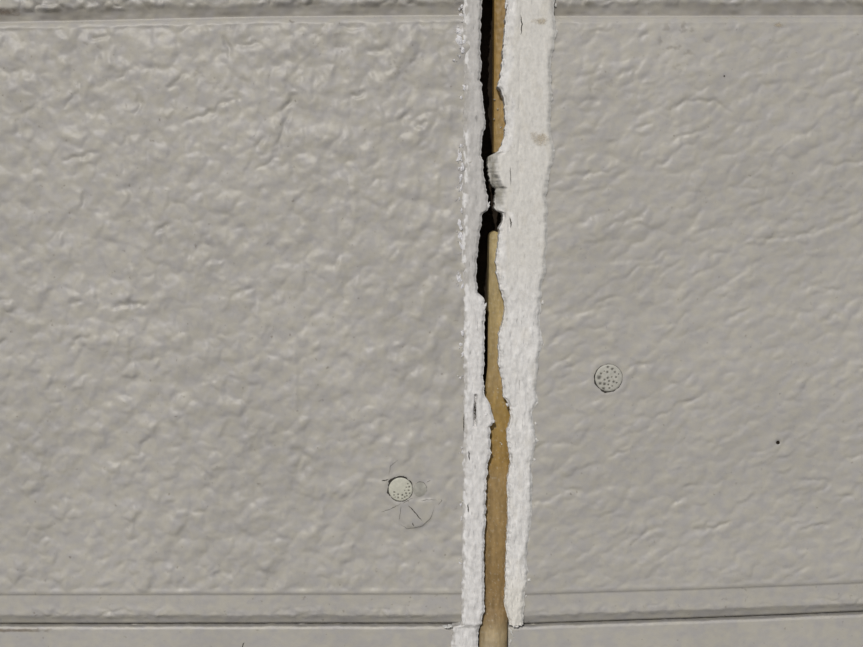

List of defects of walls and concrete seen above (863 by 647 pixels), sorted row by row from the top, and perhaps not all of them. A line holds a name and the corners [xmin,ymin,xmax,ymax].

crack [463,0,512,431]